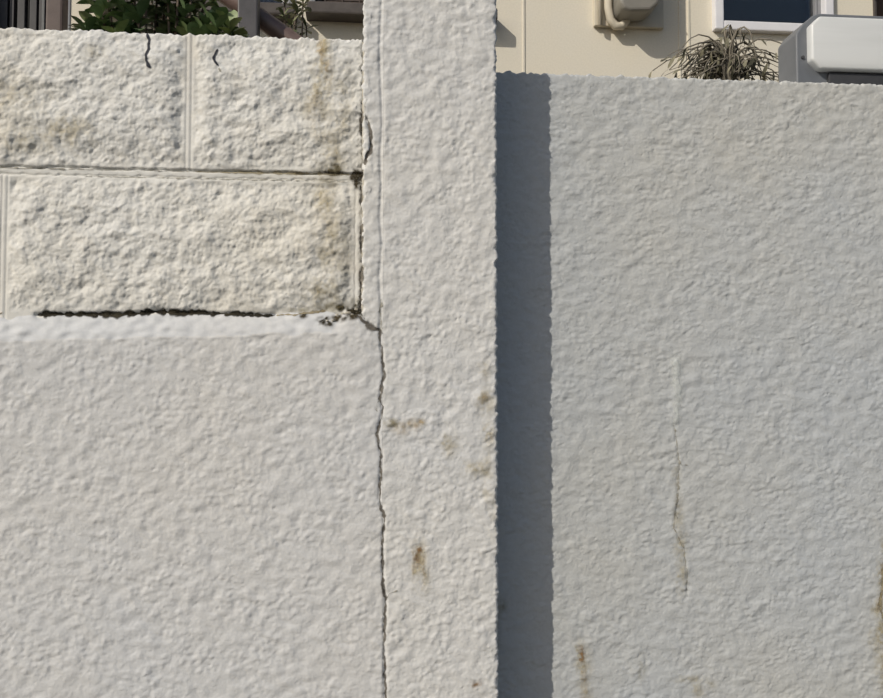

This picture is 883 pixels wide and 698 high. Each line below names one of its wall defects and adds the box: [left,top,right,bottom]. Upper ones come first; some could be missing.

crack [144,33,152,68]
crack [38,308,325,319]
crack [358,104,398,698]
crack [673,425,688,584]
crack [875,573,883,618]